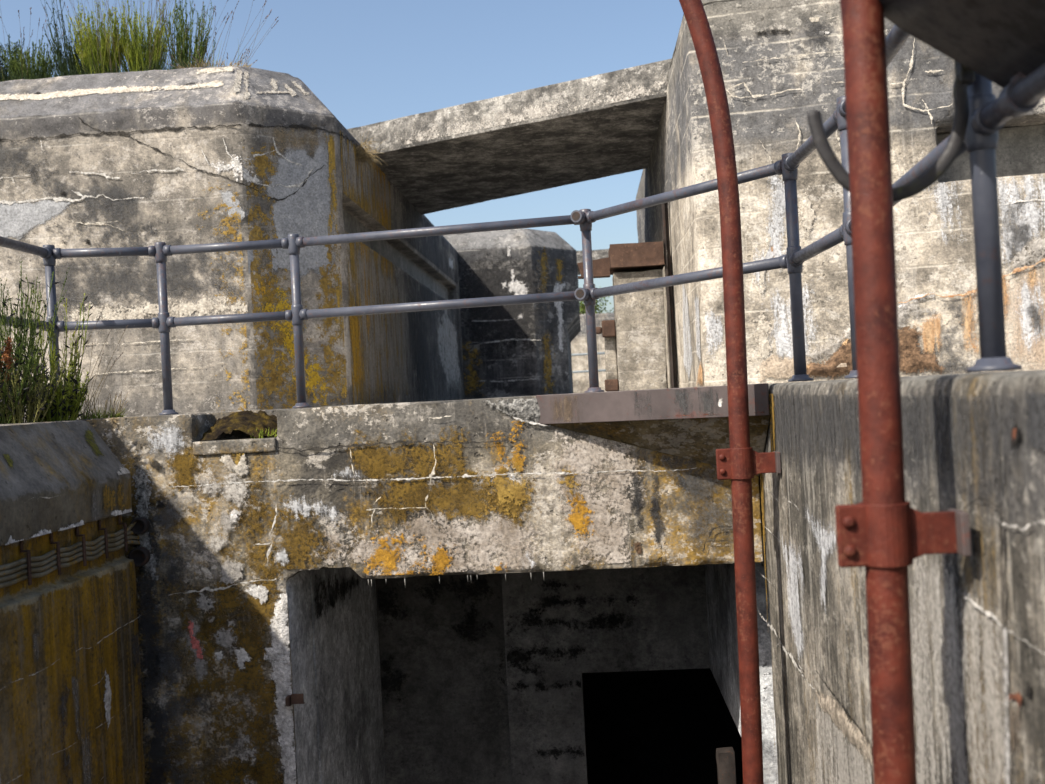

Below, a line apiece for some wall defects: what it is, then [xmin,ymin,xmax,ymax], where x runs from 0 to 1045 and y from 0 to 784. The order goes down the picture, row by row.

crack [890,38,952,124]
crack [0,117,358,231]
leakage [997,175,1045,261]
corrosion [675,389,723,416]
spalling [806,338,852,380]
spalling [897,301,945,375]
leakage [284,499,336,520]
leakage [782,539,804,657]
leakage [807,510,836,605]
crack [962,448,1045,654]
crack [757,607,863,734]
leakage [911,554,1010,784]